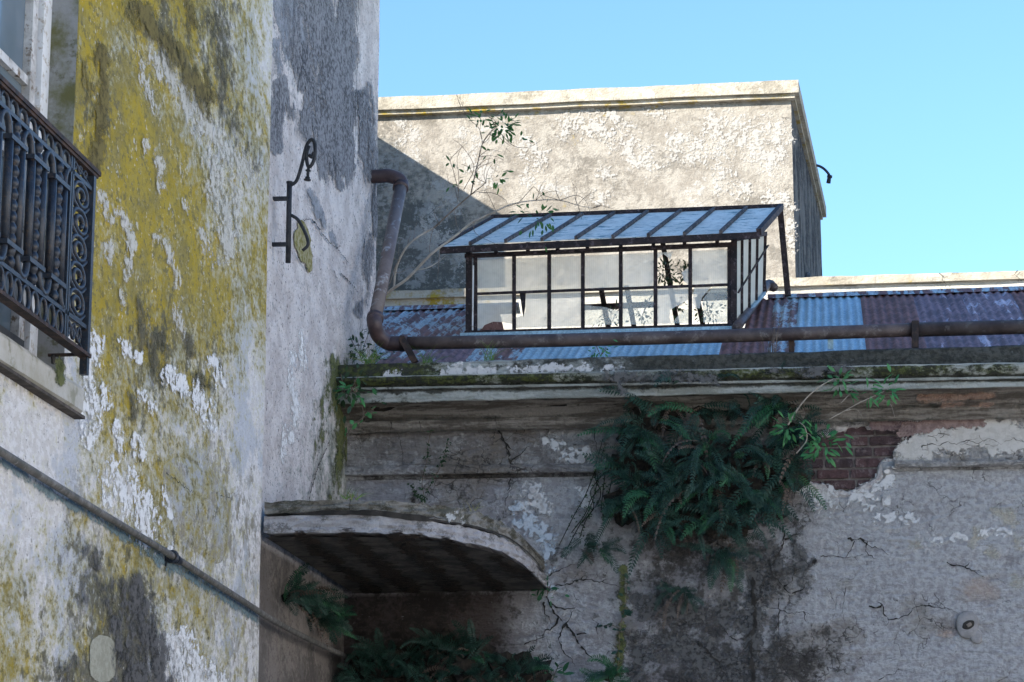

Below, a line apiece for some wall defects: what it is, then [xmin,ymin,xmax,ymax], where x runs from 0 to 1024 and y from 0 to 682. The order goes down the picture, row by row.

damp [121,0,240,134]
peeling [138,46,267,267]
damp [270,0,379,319]
peeling [97,189,137,307]
peeling [153,233,187,340]
damp [440,361,627,397]
flaking render [791,419,987,499]
damp [69,542,182,682]
damp [0,458,258,623]
crack [291,416,619,665]
crack [697,525,888,681]
crack [869,594,957,623]